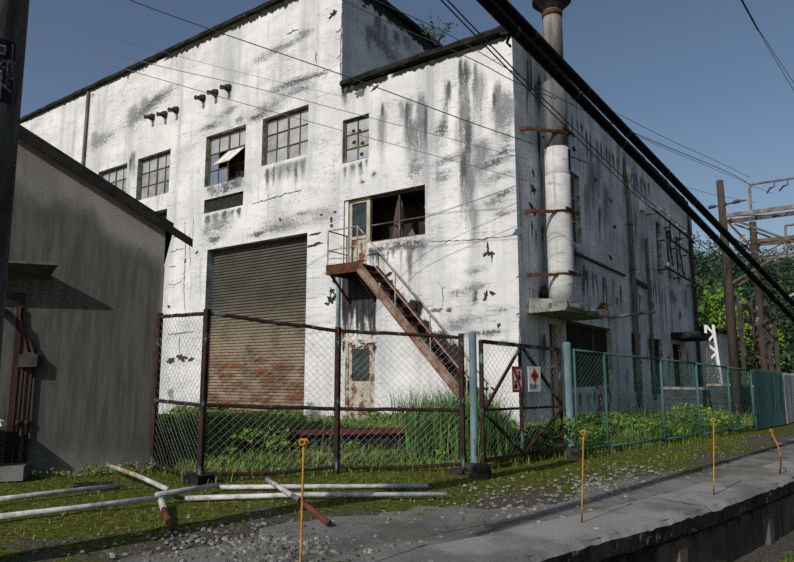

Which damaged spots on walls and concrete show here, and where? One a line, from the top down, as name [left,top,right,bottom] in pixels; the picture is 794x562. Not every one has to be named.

water stain [166,0,299,60]
water stain [254,29,314,64]
water stain [27,60,156,122]
water stain [90,130,114,147]
water stain [121,87,174,126]
water stain [202,70,326,129]
water stain [341,0,514,228]
water stain [207,177,241,196]
water stain [265,159,305,186]
crack [168,220,194,308]
water stain [574,247,622,308]